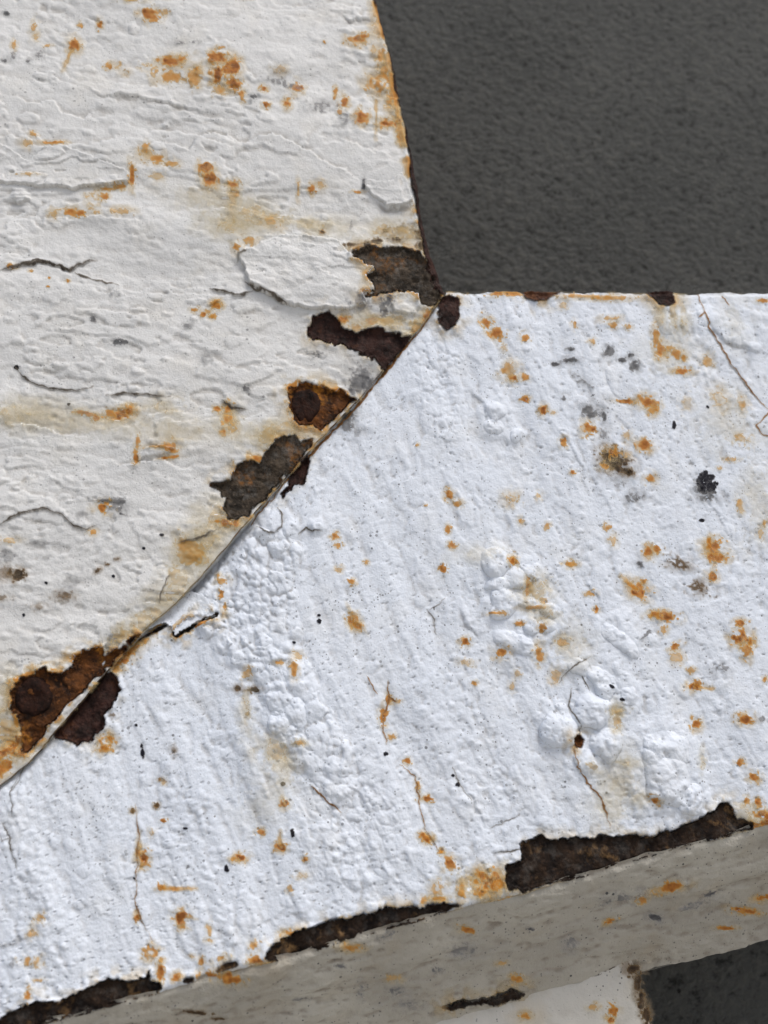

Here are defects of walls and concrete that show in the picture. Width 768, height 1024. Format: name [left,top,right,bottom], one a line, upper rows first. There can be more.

rust [146,46,246,103]
peeling [237,0,461,371]
crack [3,258,118,285]
crack [210,282,287,304]
crack [308,305,438,458]
crack [698,295,768,436]
rust [593,433,656,482]
peeling [6,591,219,757]
rust [730,619,757,662]
rust [417,832,510,904]
peeling [505,802,754,894]
peeling [0,971,162,1024]